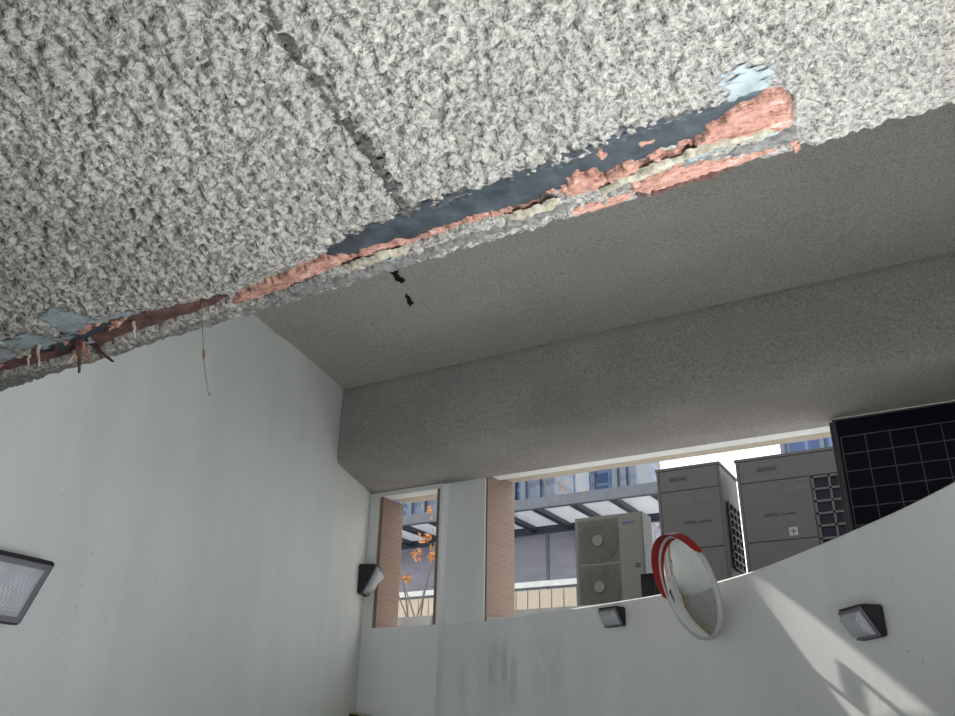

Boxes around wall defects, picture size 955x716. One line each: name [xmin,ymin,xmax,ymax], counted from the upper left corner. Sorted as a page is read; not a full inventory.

crack [259,0,413,219]
spalling [0,63,798,392]
crack [390,270,414,306]
corrosion [788,140,801,153]